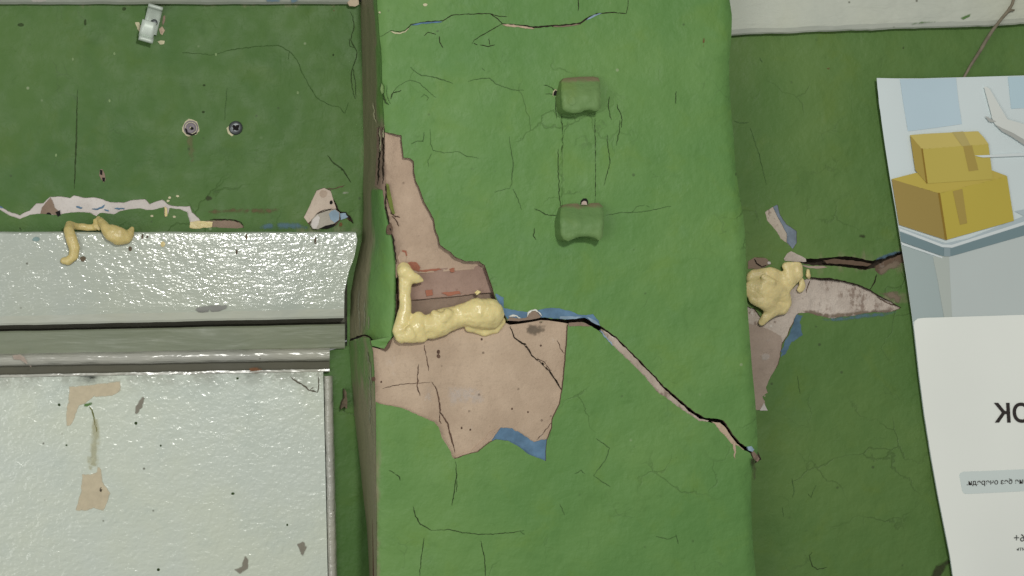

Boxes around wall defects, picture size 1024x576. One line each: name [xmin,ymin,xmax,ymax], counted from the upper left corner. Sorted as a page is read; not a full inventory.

crack [382,0,628,104]
peeling [0,195,247,240]
spalling [304,186,353,245]
spalling [372,83,495,317]
spalling [748,257,771,269]
spalling [765,205,806,262]
crack [792,251,904,289]
spalling [747,277,900,411]
peeling [66,382,120,426]
spalling [371,320,567,461]
crack [495,294,761,479]
peeling [76,468,110,511]